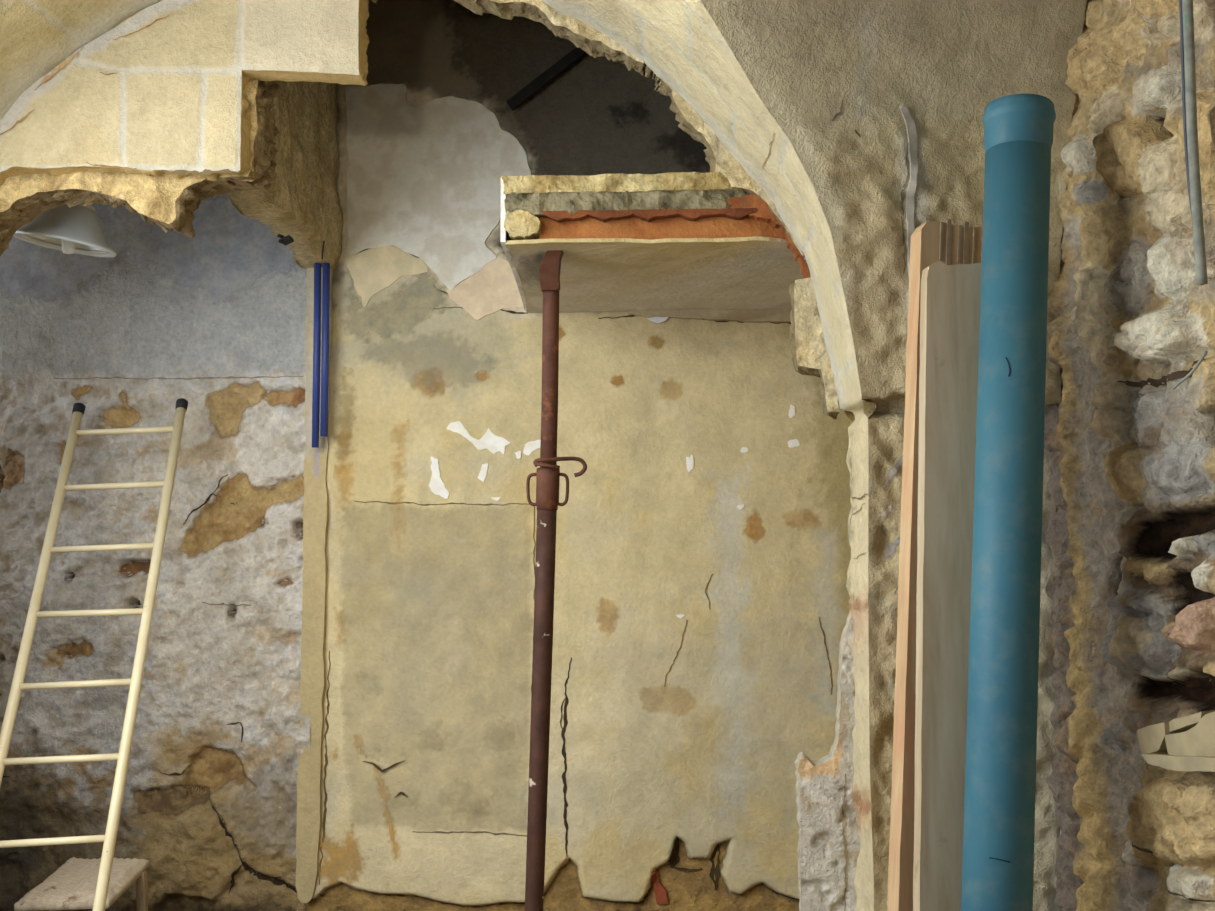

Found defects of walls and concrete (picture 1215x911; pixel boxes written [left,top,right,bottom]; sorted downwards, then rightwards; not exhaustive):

peeling [345,84,531,320]
flaking render [72,385,92,400]
flaking render [103,392,140,428]
flaking render [206,381,305,438]
peeling [429,456,449,499]
peeling [447,421,541,482]
flaking render [179,473,304,557]
crack [664,574,713,687]
crack [159,651,331,900]
flaking render [305,883,525,911]
flaking render [543,837,800,911]